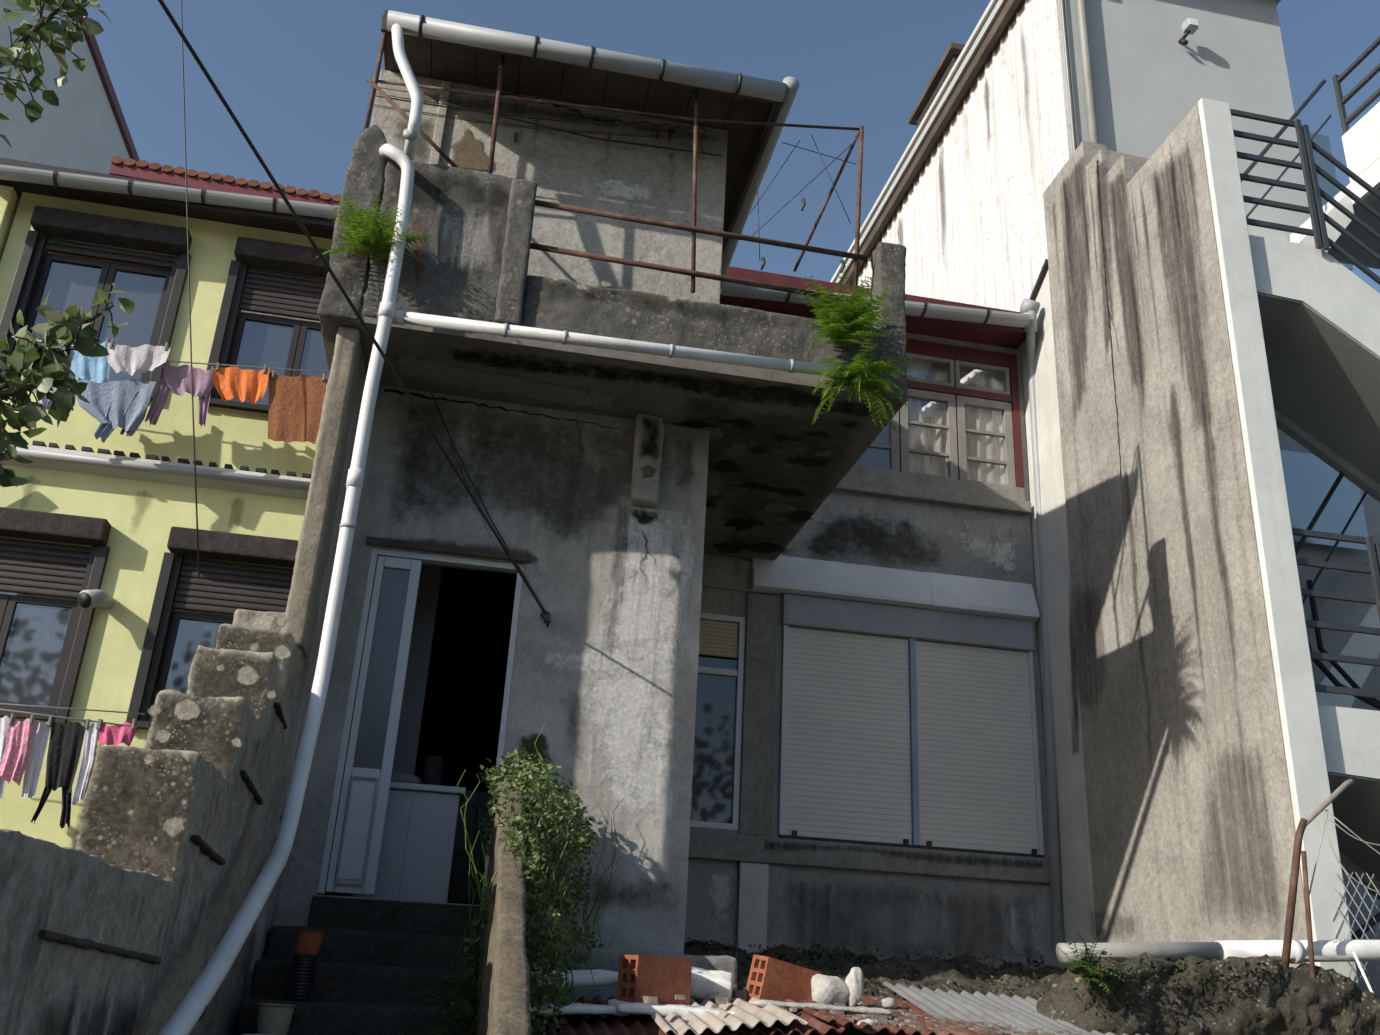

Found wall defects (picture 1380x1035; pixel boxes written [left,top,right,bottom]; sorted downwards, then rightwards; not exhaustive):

damp [400,405,694,856]
crack [635,530,694,605]
damp [813,520,938,562]
damp [1063,159,1231,752]